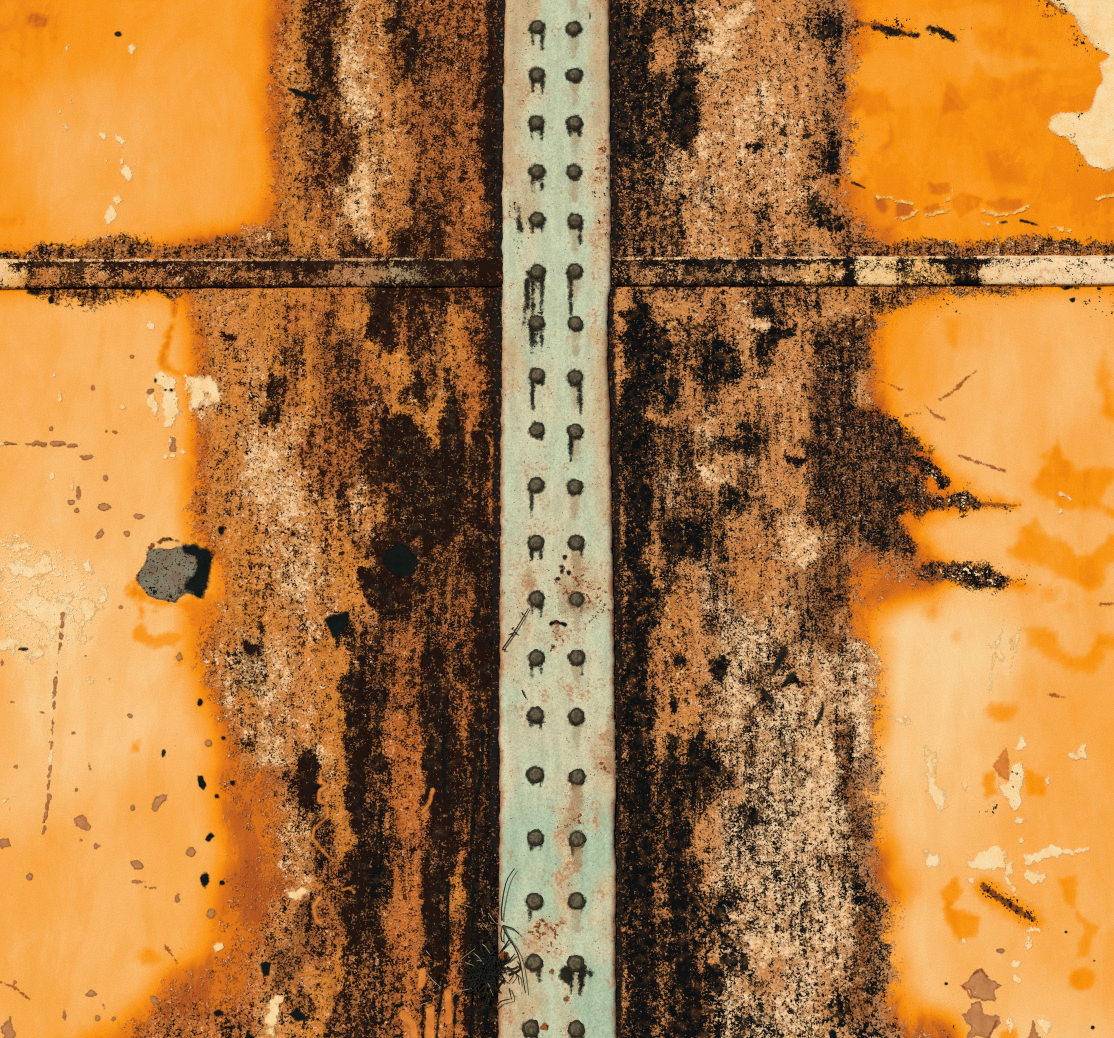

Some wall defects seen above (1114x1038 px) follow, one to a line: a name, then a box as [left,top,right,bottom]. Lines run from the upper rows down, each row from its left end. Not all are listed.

corrosion [0,0,546,260]
peeling [1030,0,1114,173]
corrosion [519,264,546,353]
corrosion [524,0,1114,1038]
peeling [0,439,231,939]
corrosion [0,287,510,1038]
peeling [1,1017,16,1038]
peeling [260,961,270,976]
peeling [245,995,306,1038]
peeling [284,887,309,901]
peeling [945,927,1041,1038]
peeling [962,736,1090,902]